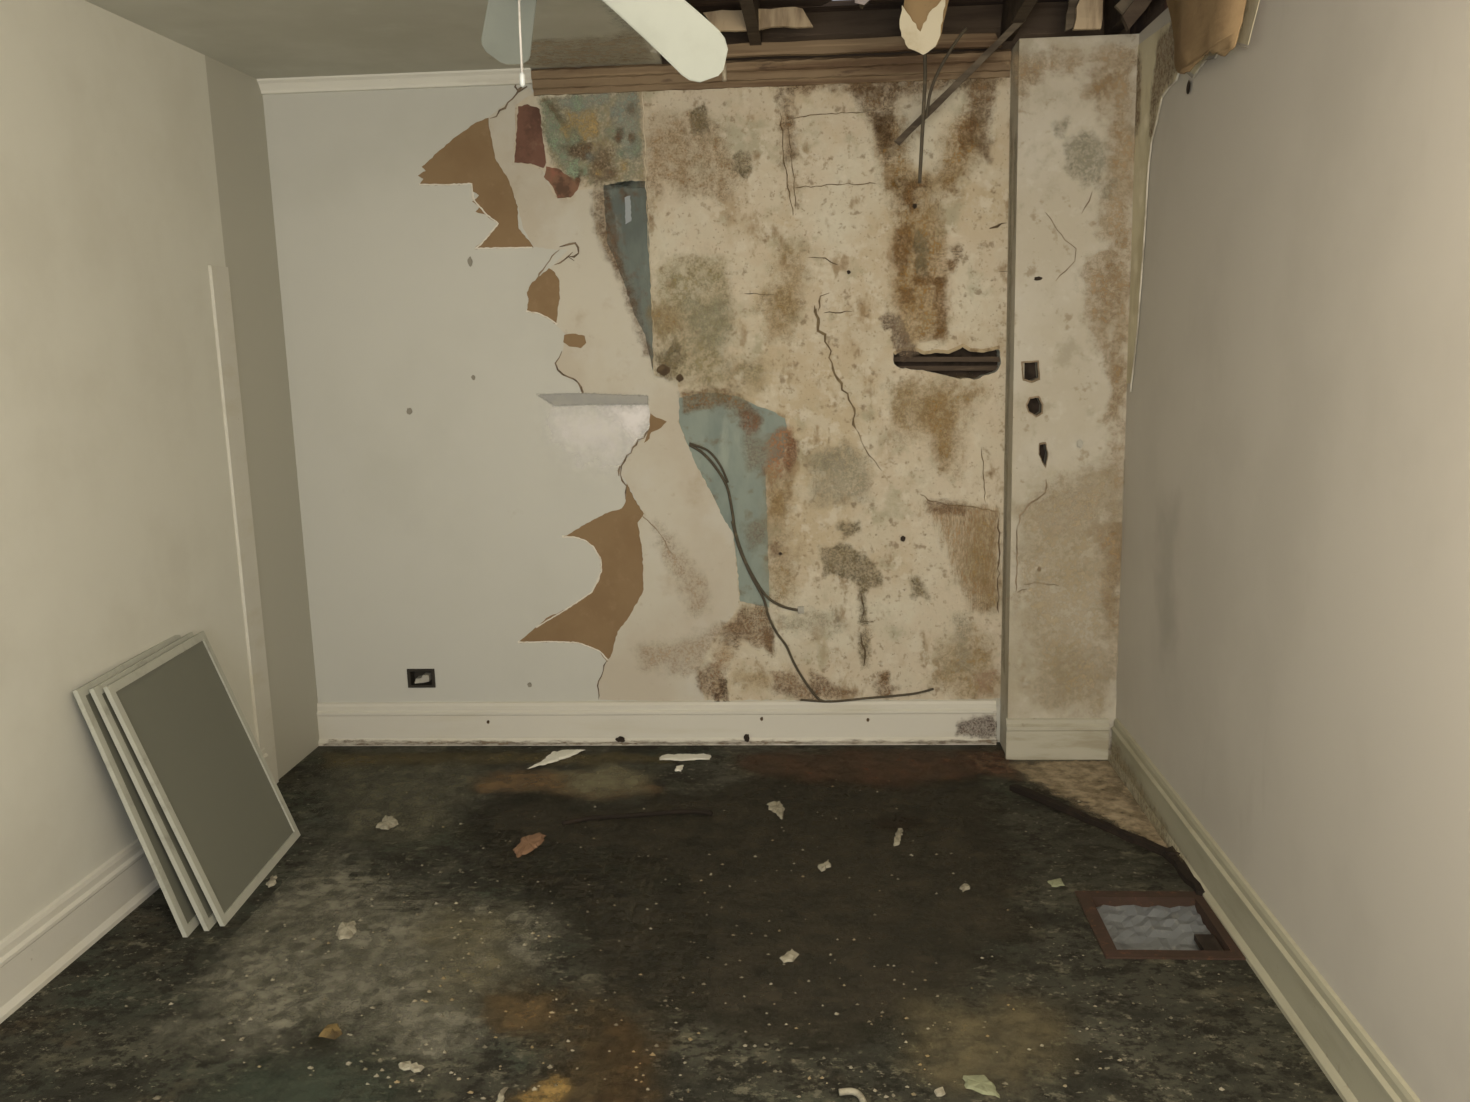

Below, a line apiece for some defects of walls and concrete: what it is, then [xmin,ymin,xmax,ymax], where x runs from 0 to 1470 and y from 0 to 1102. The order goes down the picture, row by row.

flaking render [1237,0,1260,49]
water stain [649,105,752,198]
crack [780,112,875,210]
water stain [845,78,995,158]
water stain [1020,49,1135,404]
flaking render [1127,22,1218,392]
water stain [644,259,761,383]
flaking render [418,68,1043,701]
crack [810,257,879,467]
water stain [698,605,773,702]
water stain [821,522,882,659]
crack [920,450,1058,613]